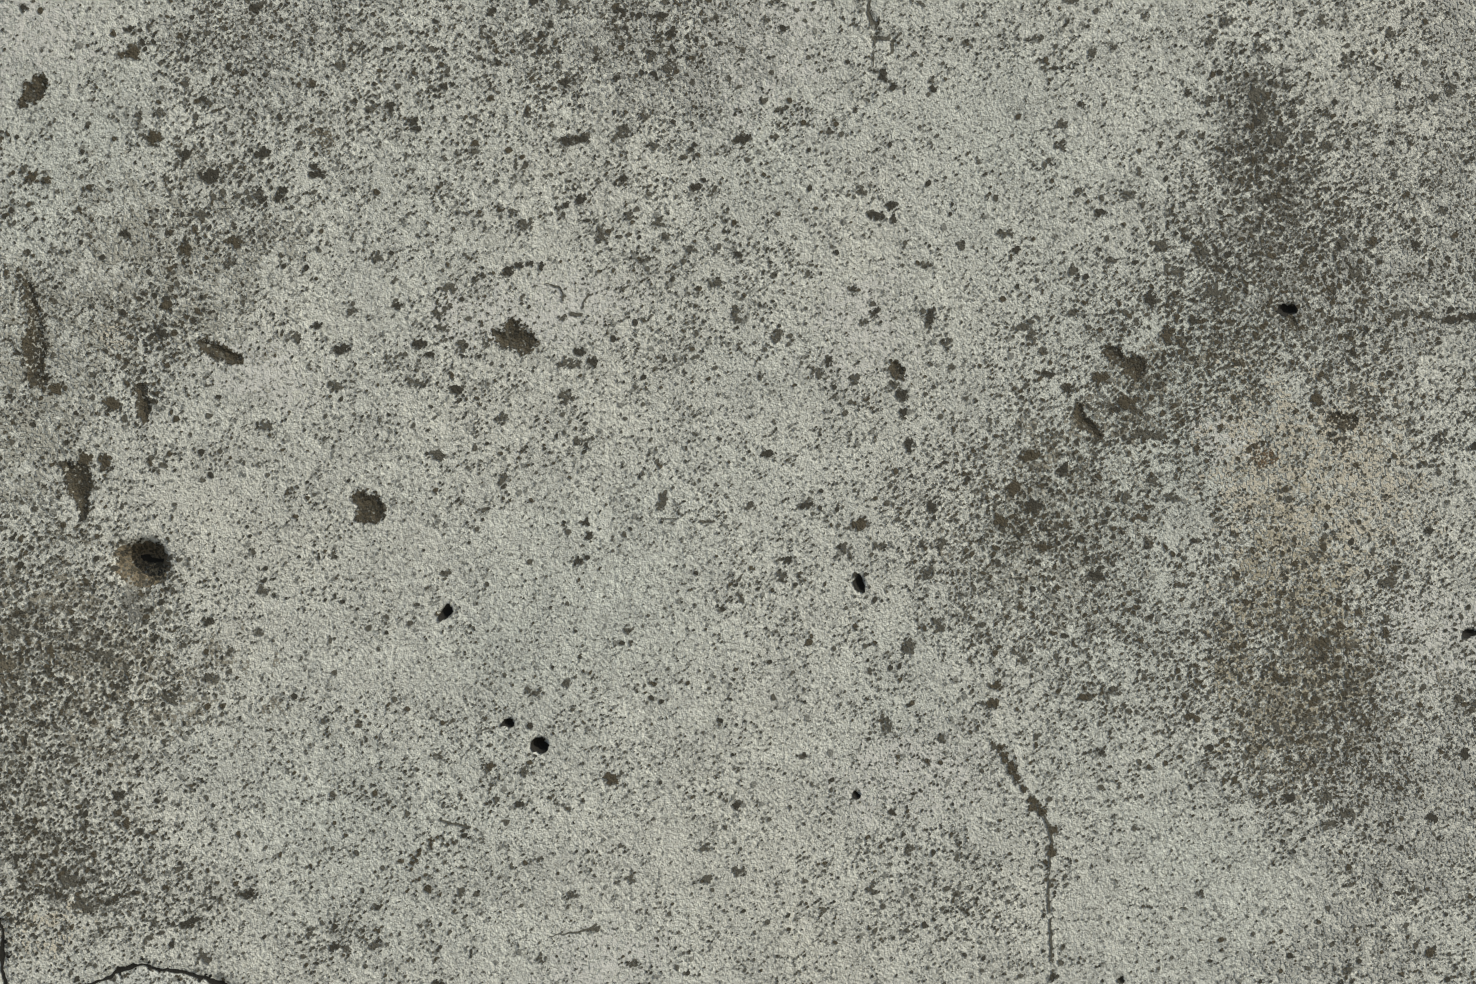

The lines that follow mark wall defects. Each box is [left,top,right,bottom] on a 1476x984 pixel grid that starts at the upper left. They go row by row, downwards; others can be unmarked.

crack [0,918,11,984]
crack [86,958,227,984]